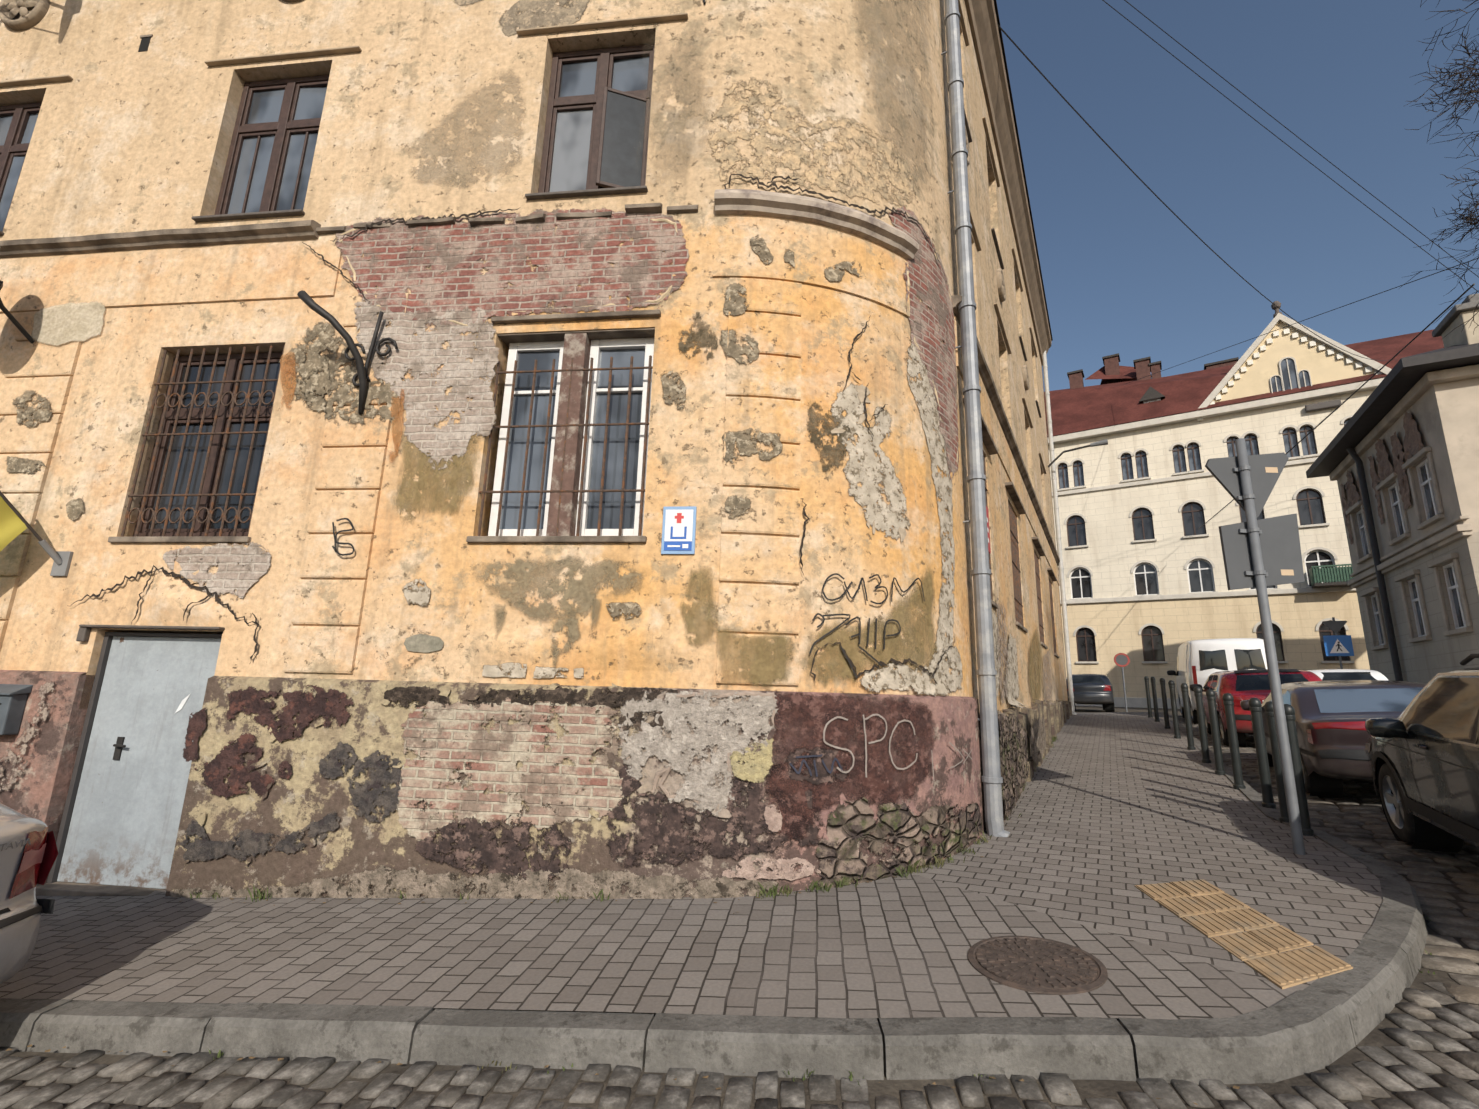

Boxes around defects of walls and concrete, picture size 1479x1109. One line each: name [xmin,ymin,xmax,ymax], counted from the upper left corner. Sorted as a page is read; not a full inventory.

flaking render [499,0,589,37]
spalling [278,208,689,470]
peeling [708,77,963,697]
crack [843,317,888,436]
crack [73,565,259,663]
peeling [162,542,271,598]
spalling [176,662,779,866]
water stain [415,815,571,881]
flaking render [170,792,982,899]